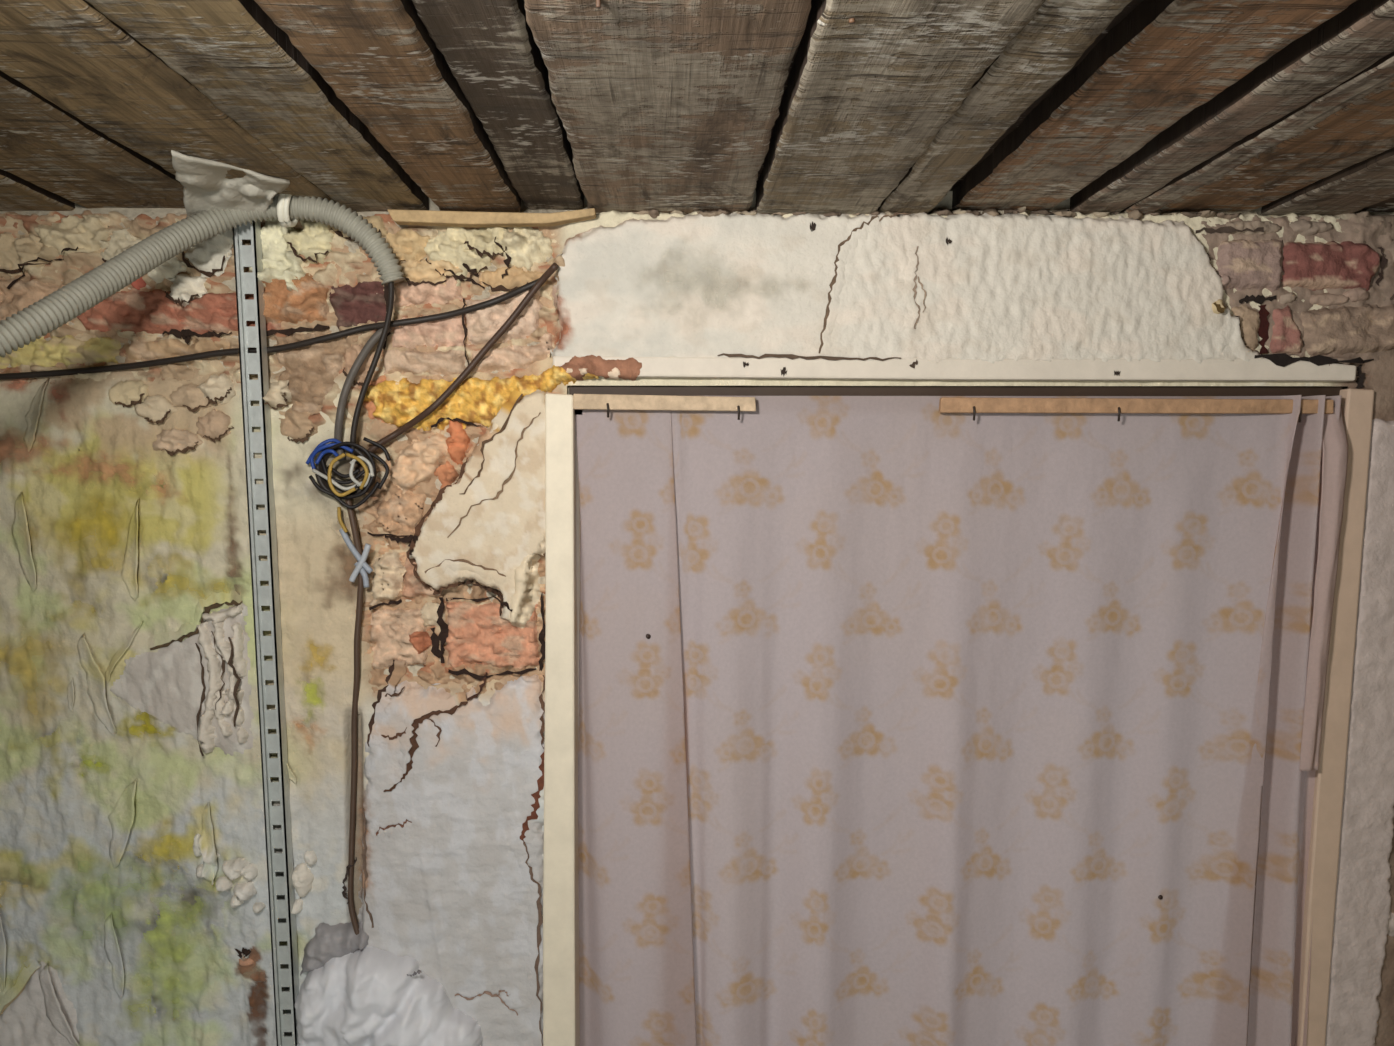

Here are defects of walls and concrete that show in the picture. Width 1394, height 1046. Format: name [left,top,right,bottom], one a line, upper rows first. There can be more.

crack [718,212,926,368]
flaking render [1195,215,1394,389]
flaking render [0,212,642,695]
crack [406,389,541,616]
leakage [129,712,159,737]
leakage [144,896,203,1017]
crack [342,660,487,928]
crack [455,675,545,1046]